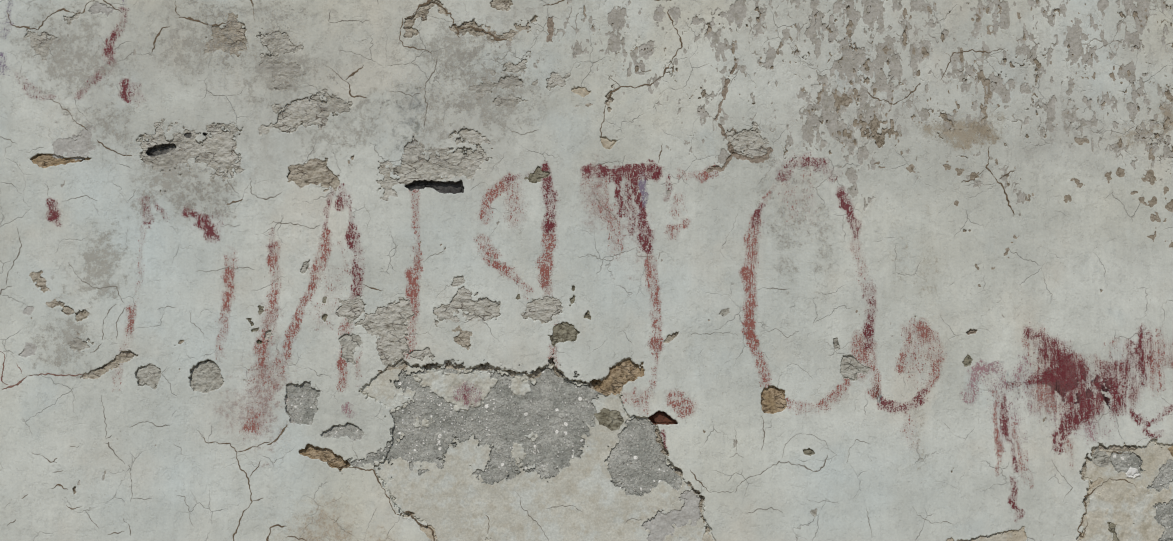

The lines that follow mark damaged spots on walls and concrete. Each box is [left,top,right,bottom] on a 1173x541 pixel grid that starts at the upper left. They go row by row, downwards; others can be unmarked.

crack [7,0,122,30]
crack [152,0,255,52]
crack [322,0,507,126]
spalling [136,119,251,188]
spalling [376,127,493,201]
peeling [403,0,1173,248]
crack [0,264,125,390]
spalling [285,381,364,441]
spalling [322,276,716,541]
crack [199,425,287,541]
crack [347,466,435,541]
spalling [1076,438,1173,541]